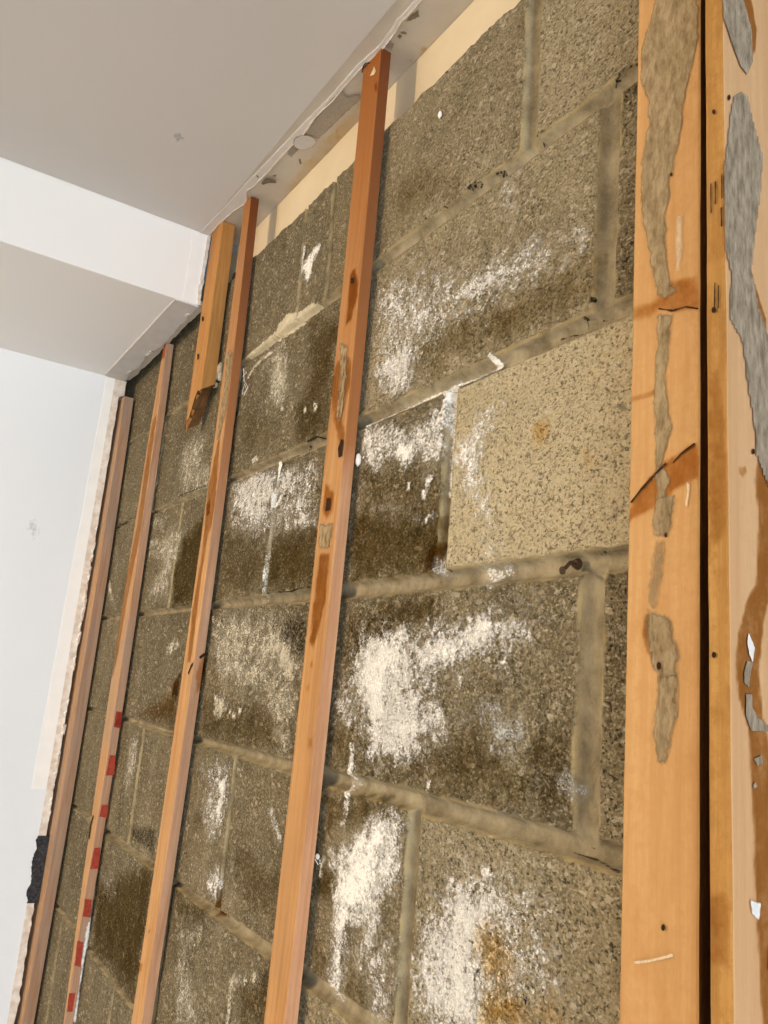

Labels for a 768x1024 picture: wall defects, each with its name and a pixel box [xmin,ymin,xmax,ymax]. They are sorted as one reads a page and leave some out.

water stain [248,342,317,412]
water stain [374,241,550,394]
water stain [233,456,316,601]
crack [631,443,695,503]
water stain [338,607,531,767]
water stain [343,743,362,824]
water stain [319,806,402,1011]